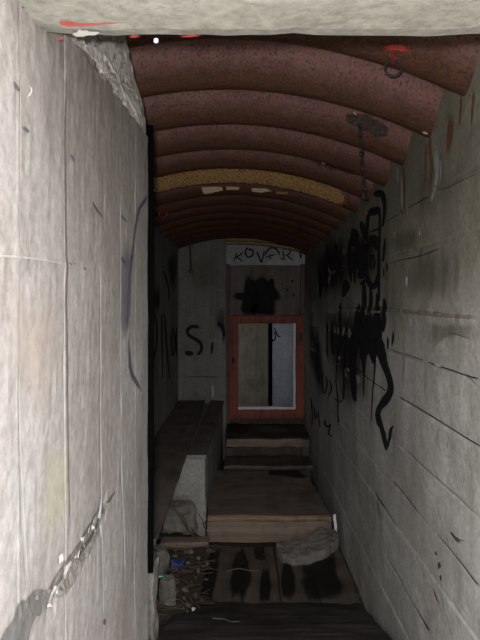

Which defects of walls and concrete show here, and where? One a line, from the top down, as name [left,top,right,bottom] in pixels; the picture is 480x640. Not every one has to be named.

spalling [73,30,144,128]
spalling [1,589,49,640]